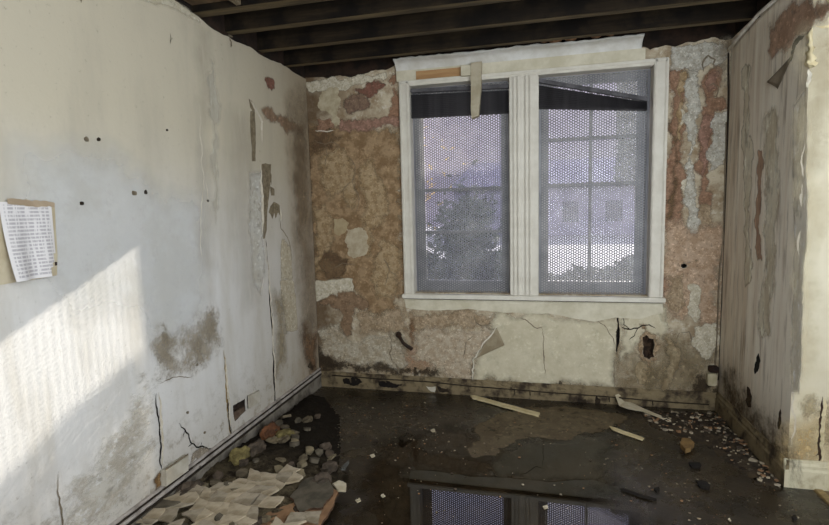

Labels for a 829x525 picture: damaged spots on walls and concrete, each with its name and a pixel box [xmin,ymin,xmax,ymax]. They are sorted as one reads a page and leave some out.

flaking render [249,73,404,316]
flaking render [663,55,727,326]
peeling [741,65,780,338]
peeling [768,0,829,445]
mould [154,312,219,375]
peeling [408,309,496,379]
crack [521,318,546,373]
crack [598,318,706,386]
crack [179,423,211,449]
damp [624,341,816,470]
crack [816,397,827,461]